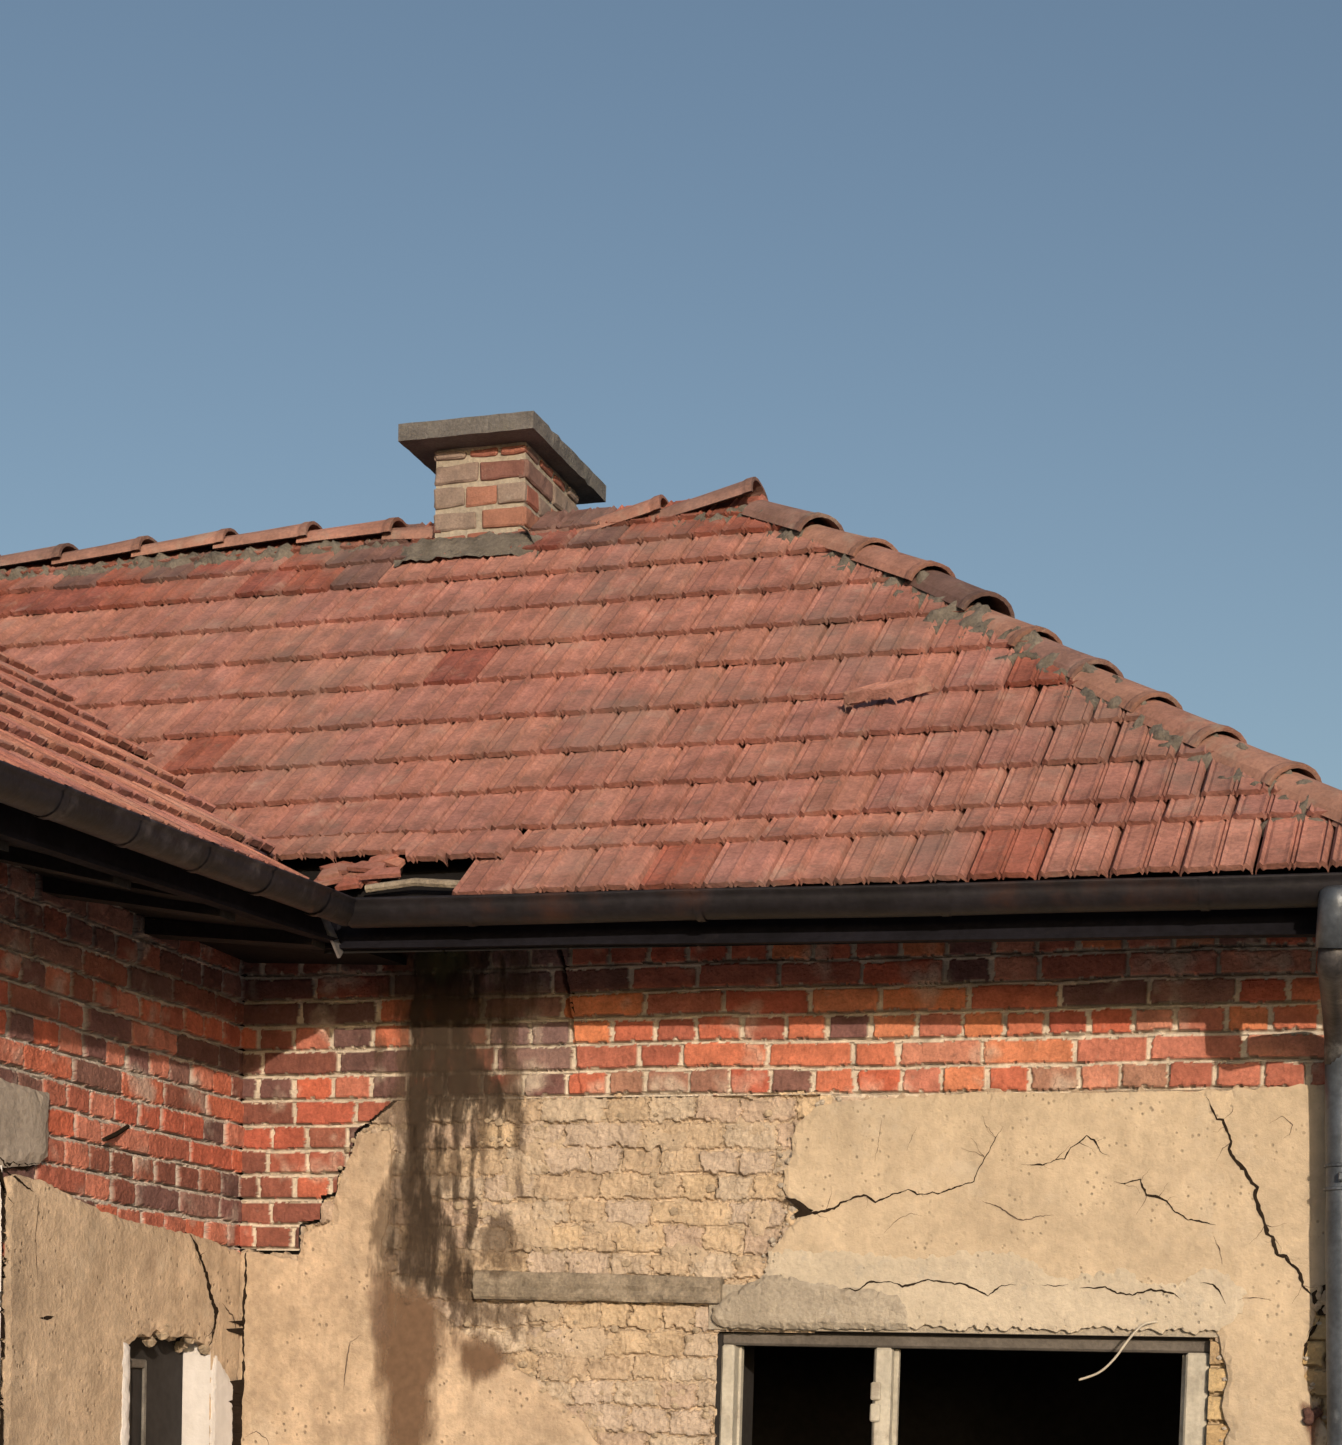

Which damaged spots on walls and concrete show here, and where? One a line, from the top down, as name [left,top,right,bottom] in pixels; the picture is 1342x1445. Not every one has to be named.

crack [185,1232,269,1445]
leakage [373,951,508,1445]
spalling [275,1091,842,1445]
crack [785,1117,1050,1233]
crack [842,1098,1320,1362]
spalling [1302,1284,1327,1445]